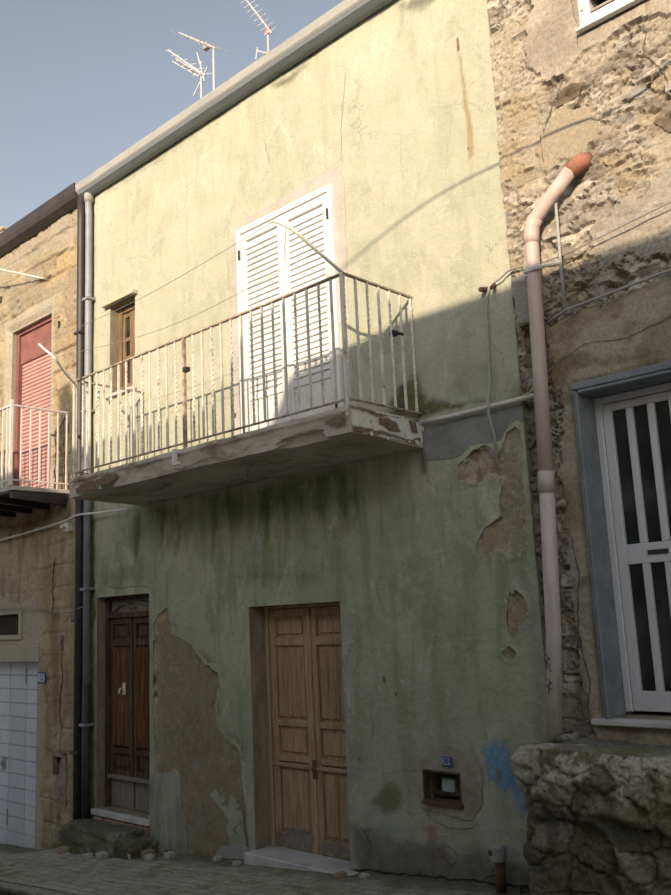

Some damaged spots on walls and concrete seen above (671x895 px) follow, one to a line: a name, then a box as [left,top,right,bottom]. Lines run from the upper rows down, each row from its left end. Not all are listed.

spalling [548,83,584,107]
corrosion [464,105,472,155]
spalling [654,113,671,133]
crack [560,316,671,361]
peeling [325,406,425,445]
peeling [459,427,531,561]
peeling [508,589,529,637]